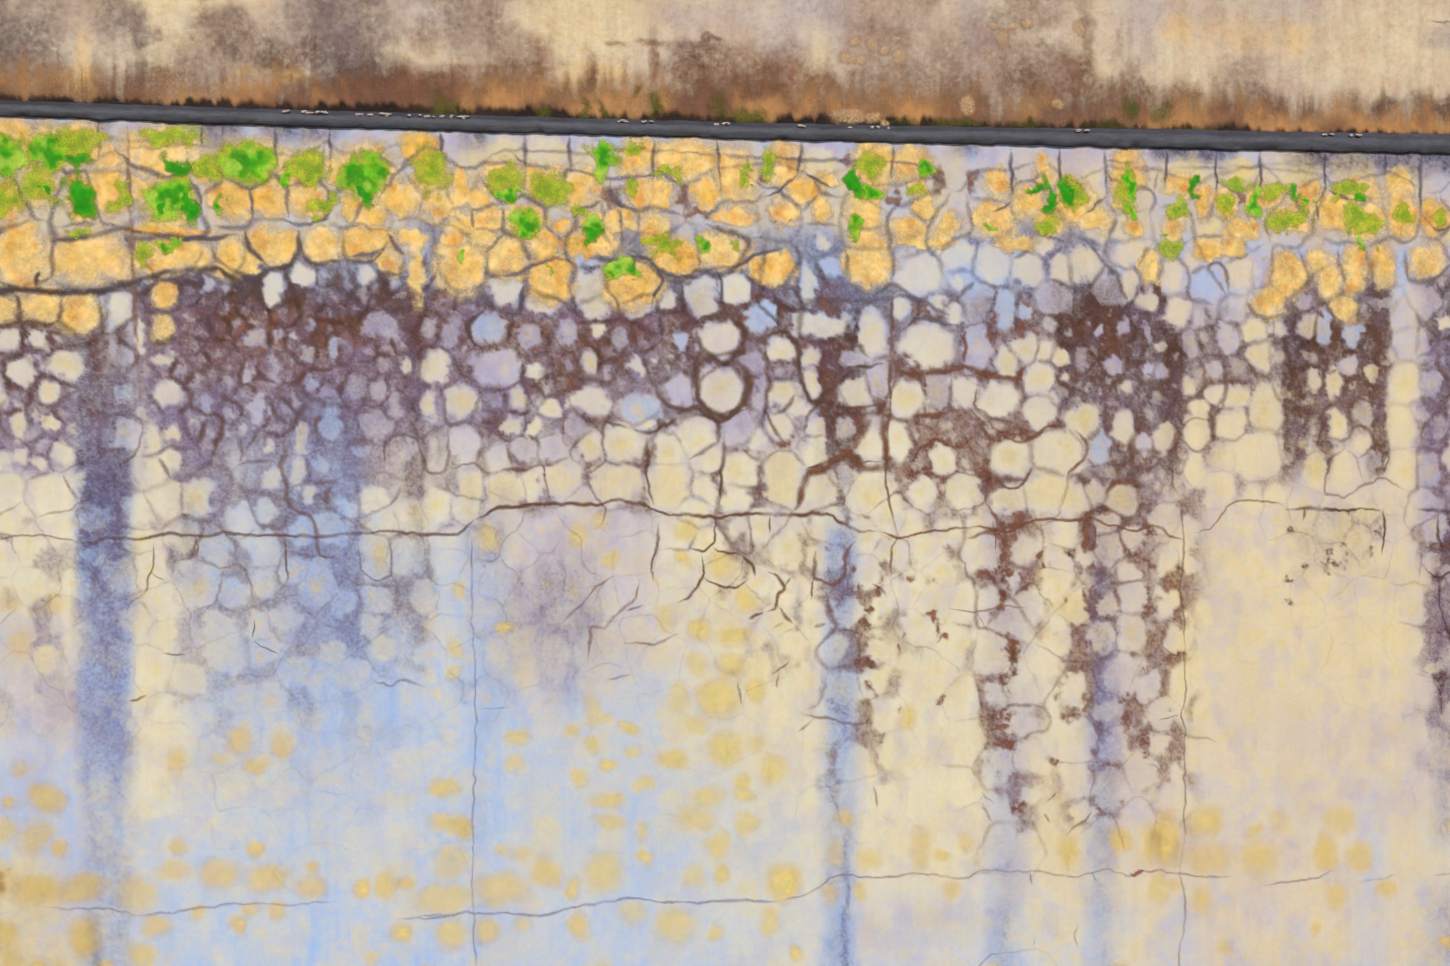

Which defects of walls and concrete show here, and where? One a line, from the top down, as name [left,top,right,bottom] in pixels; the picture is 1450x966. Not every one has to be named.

damp [0,0,1450,142]
crack [1384,156,1422,200]
damp [0,224,1037,672]
crack [0,135,1386,657]
damp [987,276,1392,526]
corrosion [979,566,1014,610]
corrosion [990,711,1014,749]
corrosion [1001,640,1020,685]
damp [1069,508,1114,764]
corrosion [1119,694,1149,758]
damp [1131,565,1193,695]
crack [1423,509,1450,635]